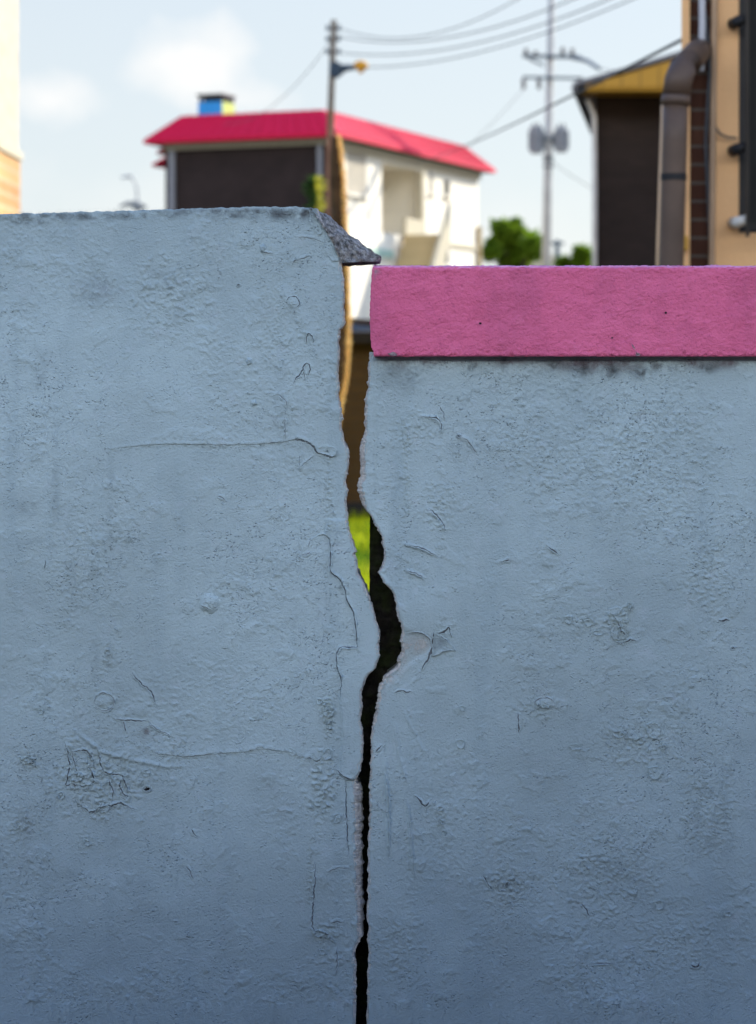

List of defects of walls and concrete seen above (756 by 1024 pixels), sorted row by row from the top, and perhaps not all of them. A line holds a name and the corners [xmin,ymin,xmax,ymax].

crack [108,362,338,471]
spalling [301,207,457,1024]